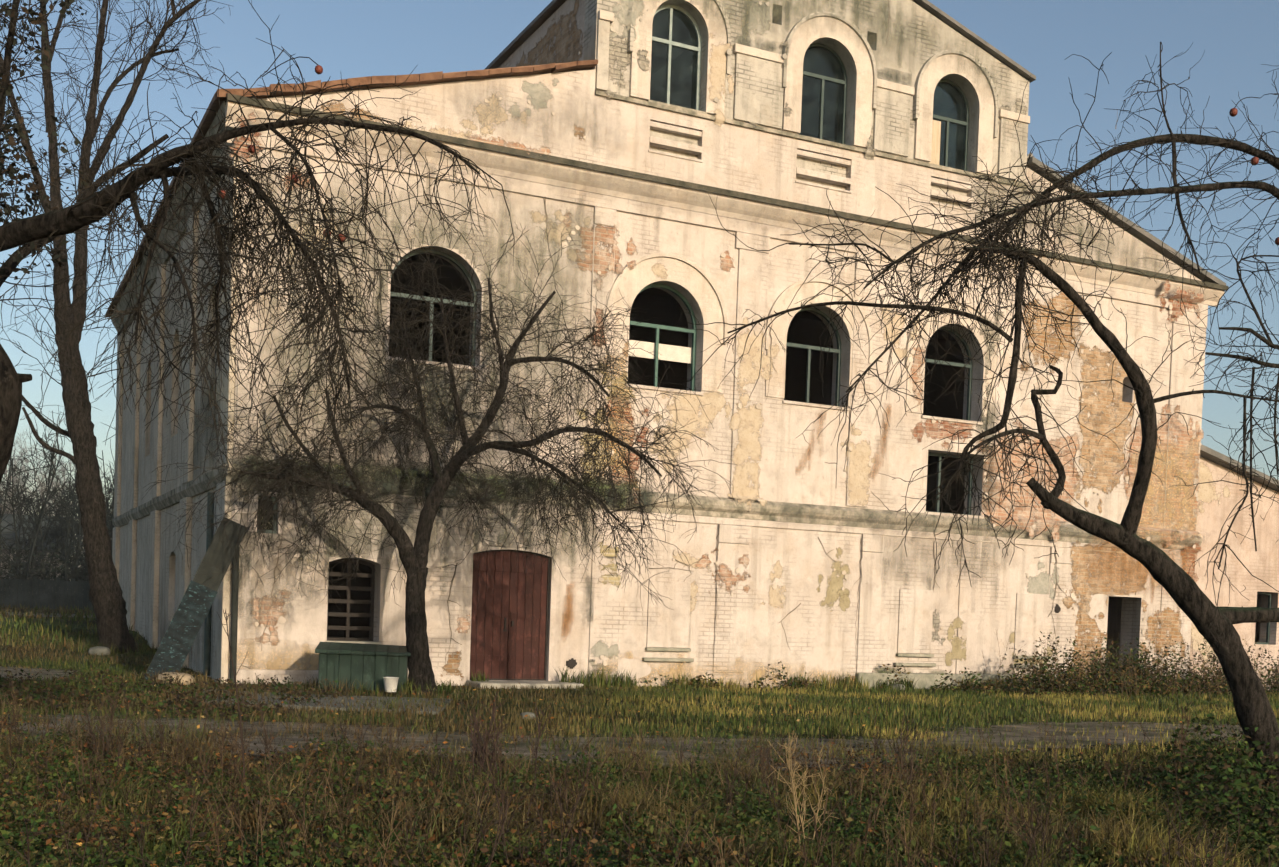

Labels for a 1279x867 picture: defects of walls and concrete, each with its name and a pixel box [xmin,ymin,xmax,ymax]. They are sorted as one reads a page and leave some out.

spalling [404,0,583,155]
spalling [530,210,638,290]
spalling [720,246,735,272]
spalling [1157,279,1204,324]
peeling [881,308,925,405]
peeling [575,317,779,511]
spalling [911,292,1230,681]
spalling [597,541,623,588]
peeling [672,548,751,612]
peeling [816,547,850,612]
spalling [249,588,291,646]
spalling [441,651,464,678]